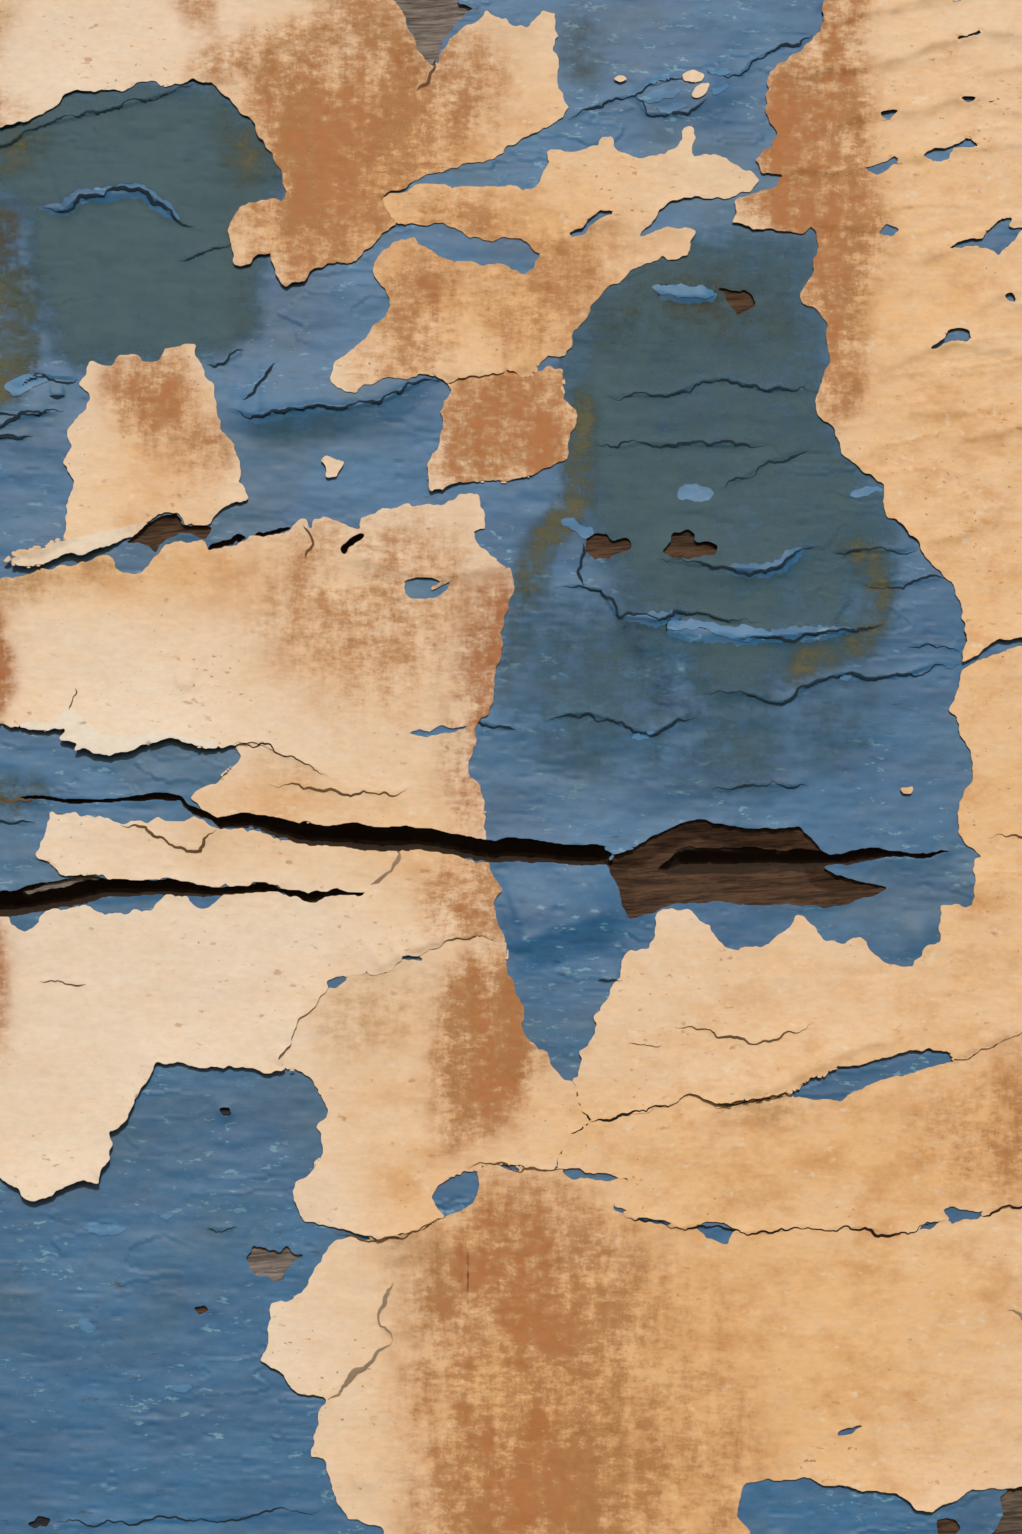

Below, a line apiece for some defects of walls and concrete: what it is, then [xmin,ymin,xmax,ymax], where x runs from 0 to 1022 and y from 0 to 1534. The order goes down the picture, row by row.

peeling [801,101,1022,167]
peeling [570,210,613,237]
peeling [951,218,1022,255]
peeling [652,283,755,315]
peeling [931,328,970,349]
peeling [663,506,763,559]
peeling [404,577,450,599]
peeling [667,616,773,643]
crack [713,781,809,790]
crack [0,742,612,917]
crack [658,847,948,876]
peeling [0,799,1022,1534]